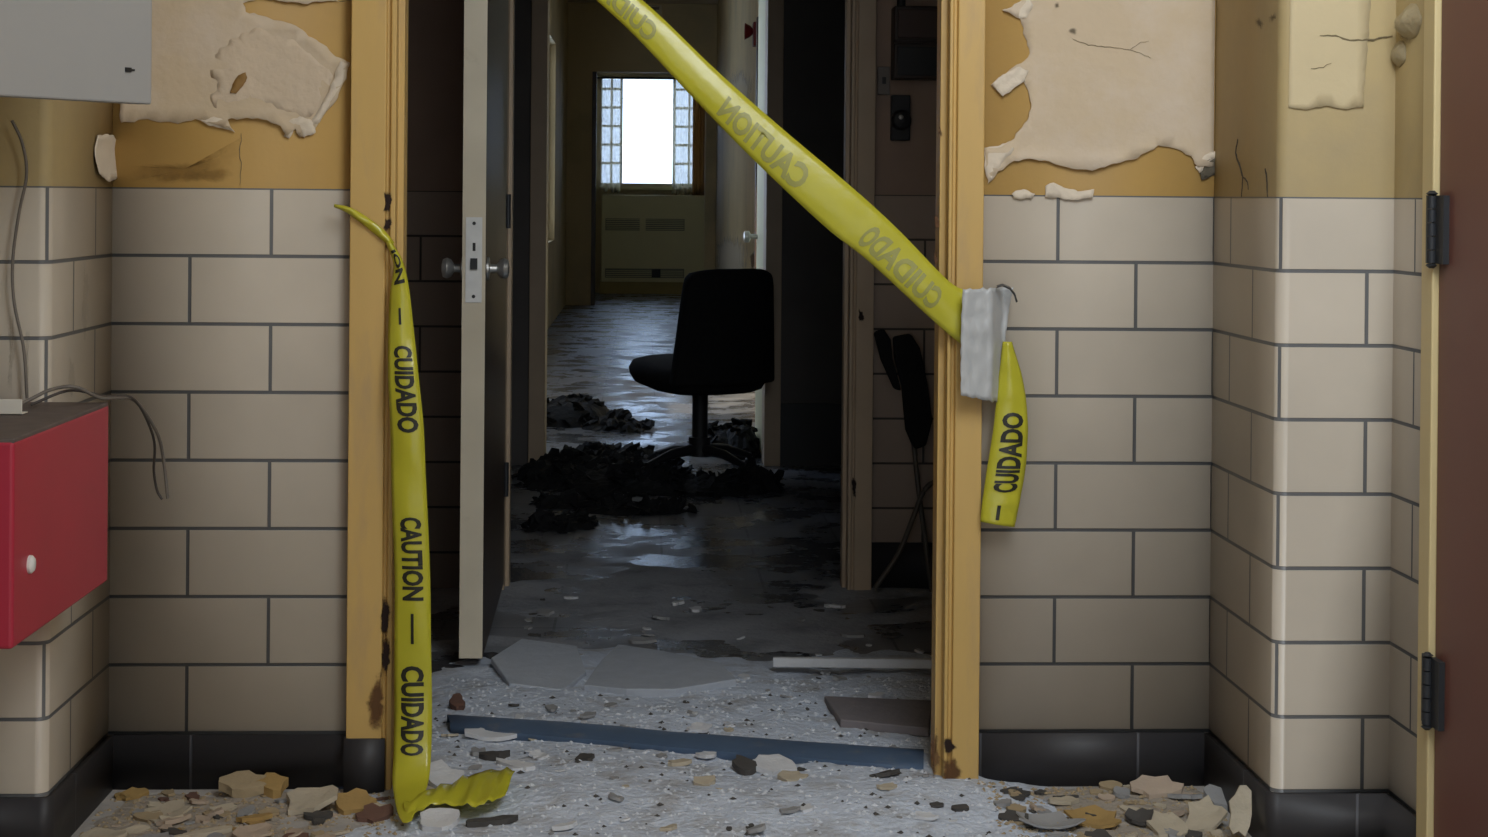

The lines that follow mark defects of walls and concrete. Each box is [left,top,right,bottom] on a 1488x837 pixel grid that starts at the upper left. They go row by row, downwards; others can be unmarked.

peeling [95,0,350,182]
peeling [984,0,1215,200]
crack [1311,35,1392,69]